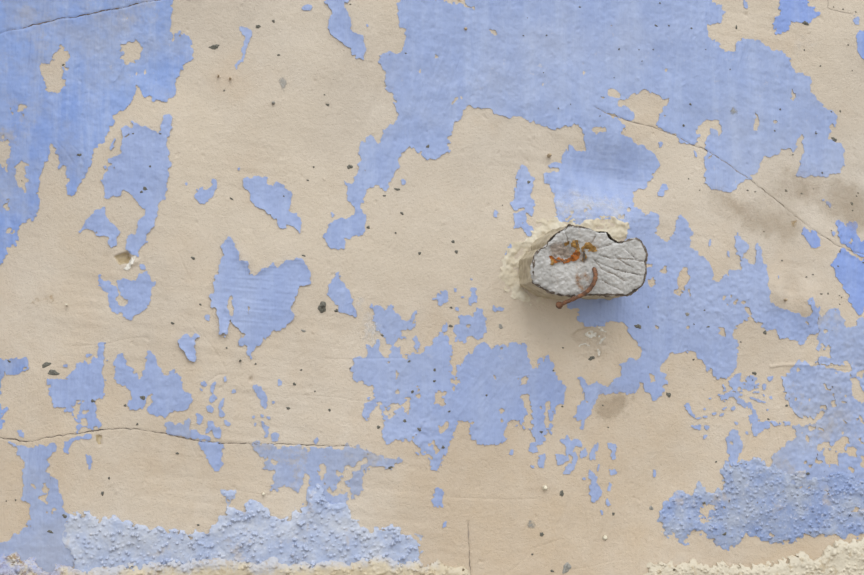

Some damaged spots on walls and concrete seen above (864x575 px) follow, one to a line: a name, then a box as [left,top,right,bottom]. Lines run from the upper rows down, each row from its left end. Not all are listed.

crack [12,0,158,30]
peeling [235,26,252,69]
peeling [0,0,194,320]
peeling [185,179,217,204]
peeling [238,168,302,233]
corrosion [549,240,597,265]
peeling [323,0,864,515]
peeling [204,236,311,359]
peeling [178,333,200,362]
peeling [0,342,236,573]
peeling [252,384,403,504]